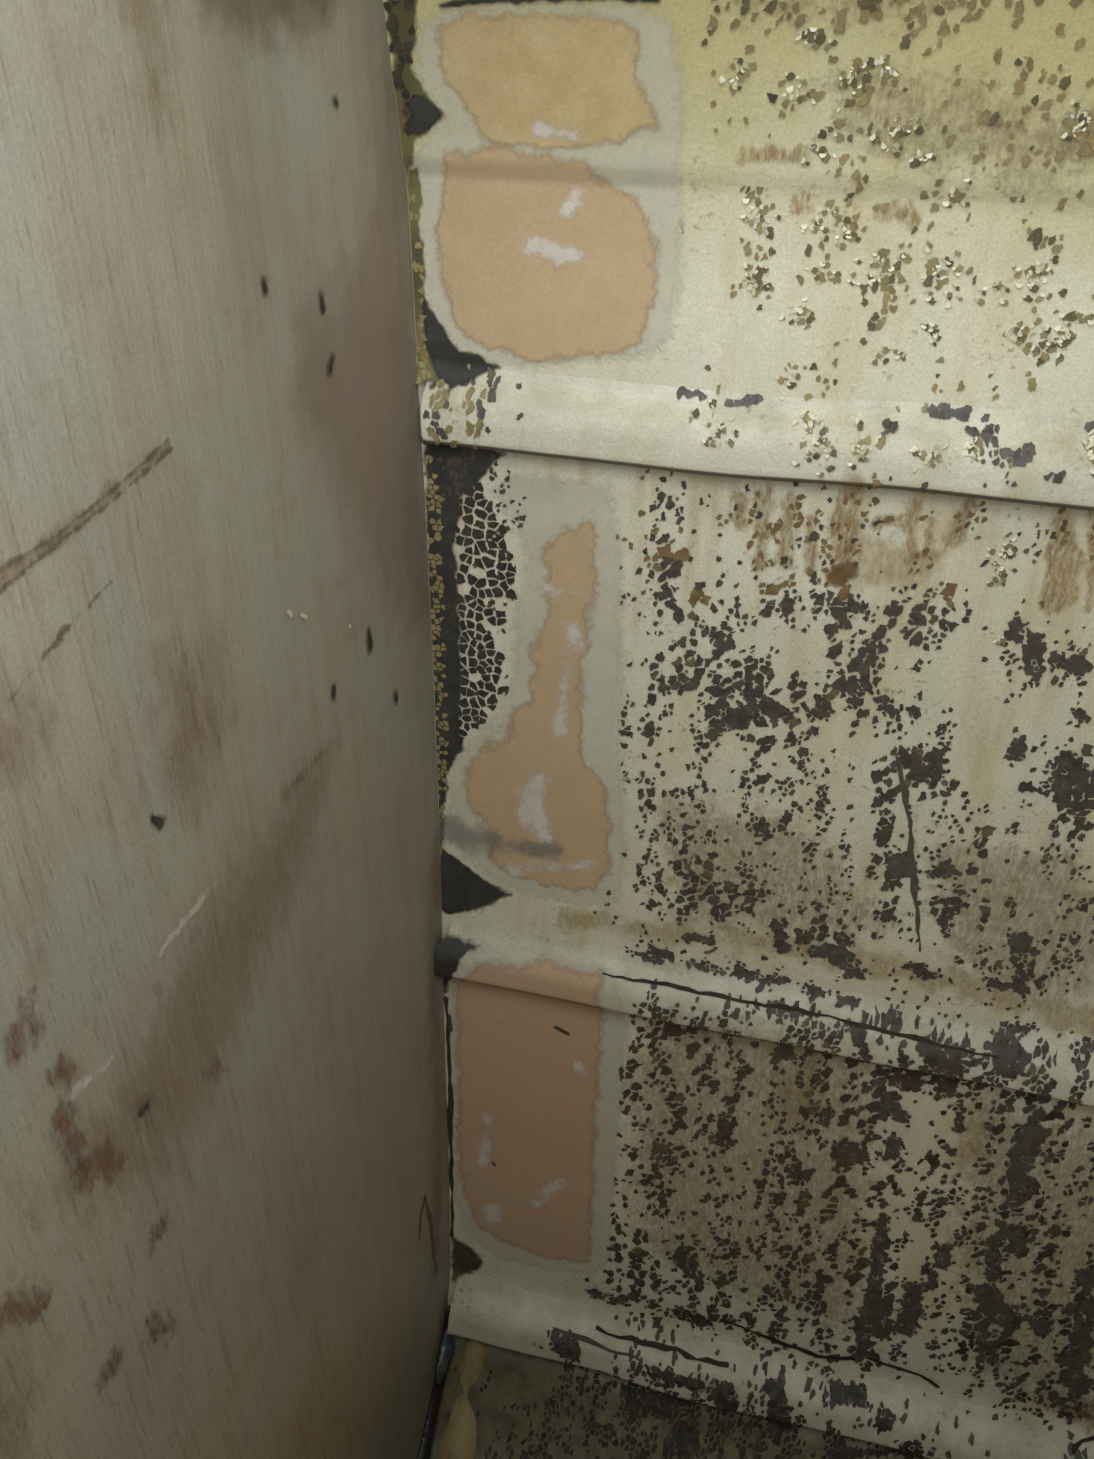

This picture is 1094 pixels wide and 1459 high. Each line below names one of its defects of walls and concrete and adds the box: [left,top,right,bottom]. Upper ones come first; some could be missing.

water stain [749,146,801,161]
peeling [701,0,1094,521]
peeling [412,242,527,611]
peeling [467,628,508,705]
peeling [485,341,1094,1459]
crack [602,972,998,1058]
crack [553,1325,729,1368]
crack [720,1319,940,1388]